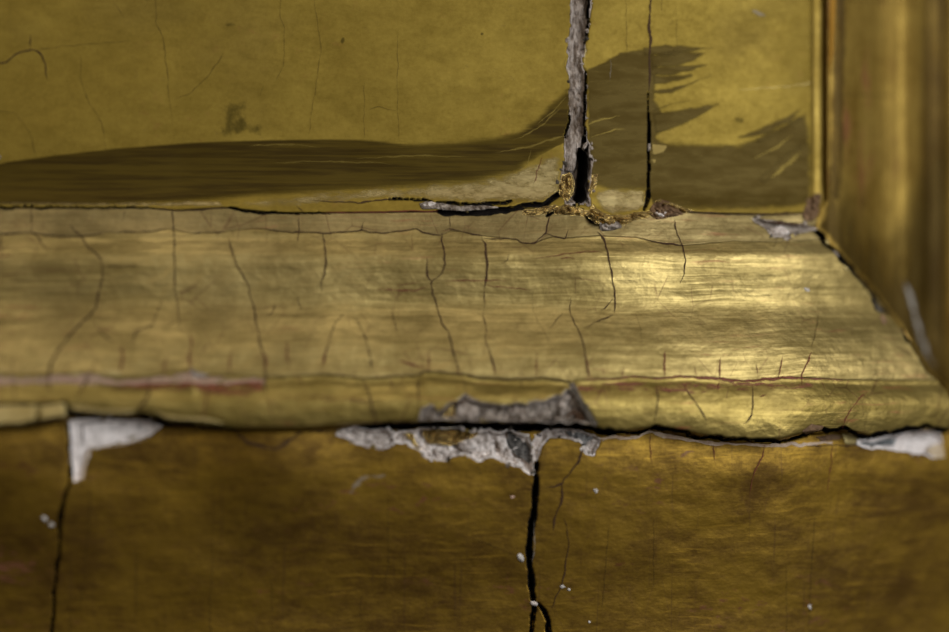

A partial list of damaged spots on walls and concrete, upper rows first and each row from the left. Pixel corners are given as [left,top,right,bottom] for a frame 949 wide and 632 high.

crack [0,0,949,491]
spalling [751,215,818,241]
spalling [69,416,162,482]
spalling [334,382,604,475]
spalling [855,429,944,459]
crack [50,408,329,632]
crack [517,451,583,632]